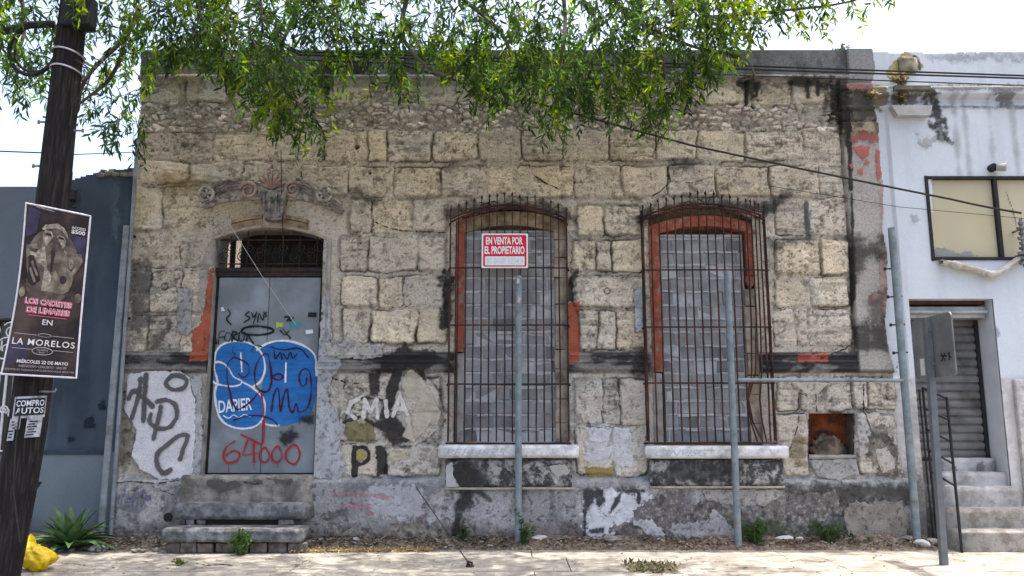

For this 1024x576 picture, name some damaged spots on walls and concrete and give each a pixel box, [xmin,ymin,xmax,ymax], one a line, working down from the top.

damp [744,82,759,106]
damp [806,81,820,99]
peeling [849,129,887,337]
damp [845,80,1024,354]
flaking render [118,231,292,491]
damp [451,459,493,537]
flaking render [579,413,910,539]